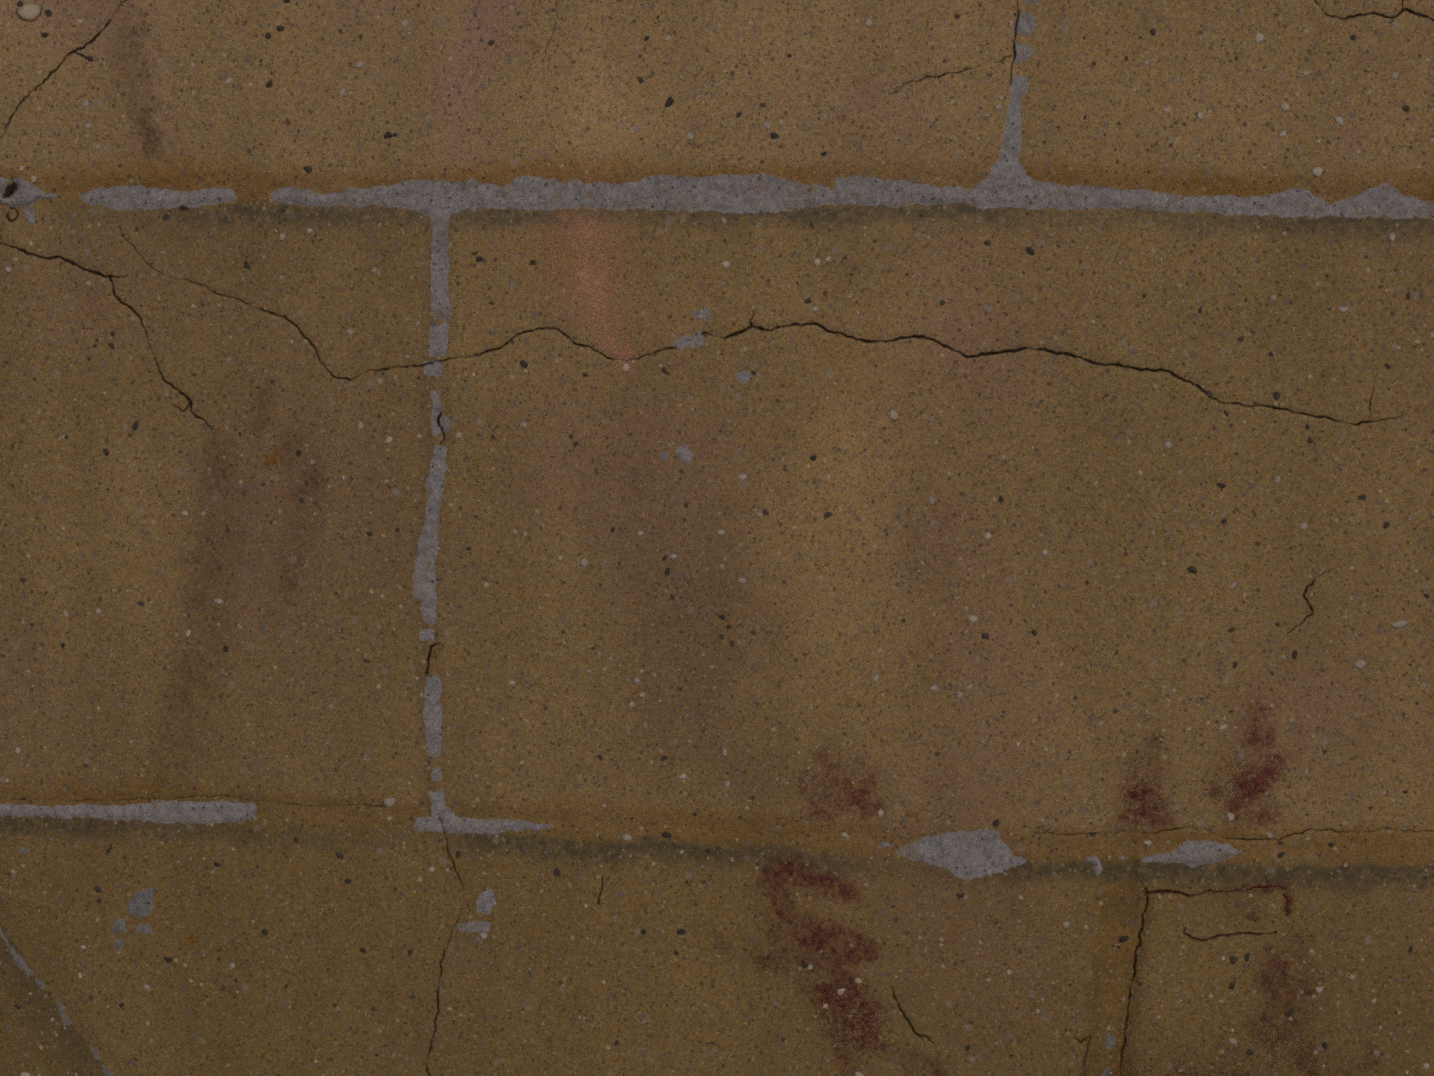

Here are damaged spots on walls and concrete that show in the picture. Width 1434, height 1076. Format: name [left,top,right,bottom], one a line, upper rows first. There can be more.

crack [0,0,127,138]
crack [891,68,968,94]
crack [1001,2,1020,85]
crack [1315,0,1434,22]
crack [2,177,1392,430]
crack [437,411,445,443]
crack [1287,580,1314,634]
crack [439,816,462,882]
crack [426,921,458,1076]
rust [762,862,879,1059]
crack [1074,887,1149,1071]